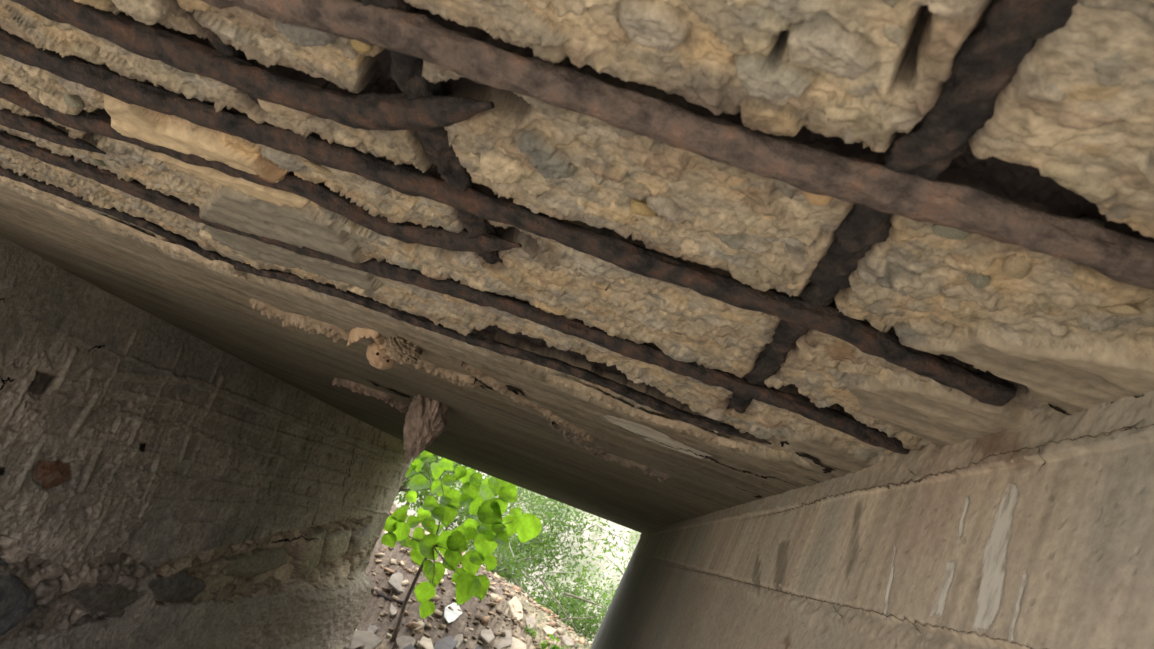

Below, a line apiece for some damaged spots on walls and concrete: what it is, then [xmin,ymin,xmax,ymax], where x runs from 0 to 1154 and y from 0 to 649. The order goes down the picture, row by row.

rust [258,157,284,184]
spalling [0,0,1154,465]
spalling [461,361,671,484]
crack [620,395,1154,521]
crack [667,565,1047,649]